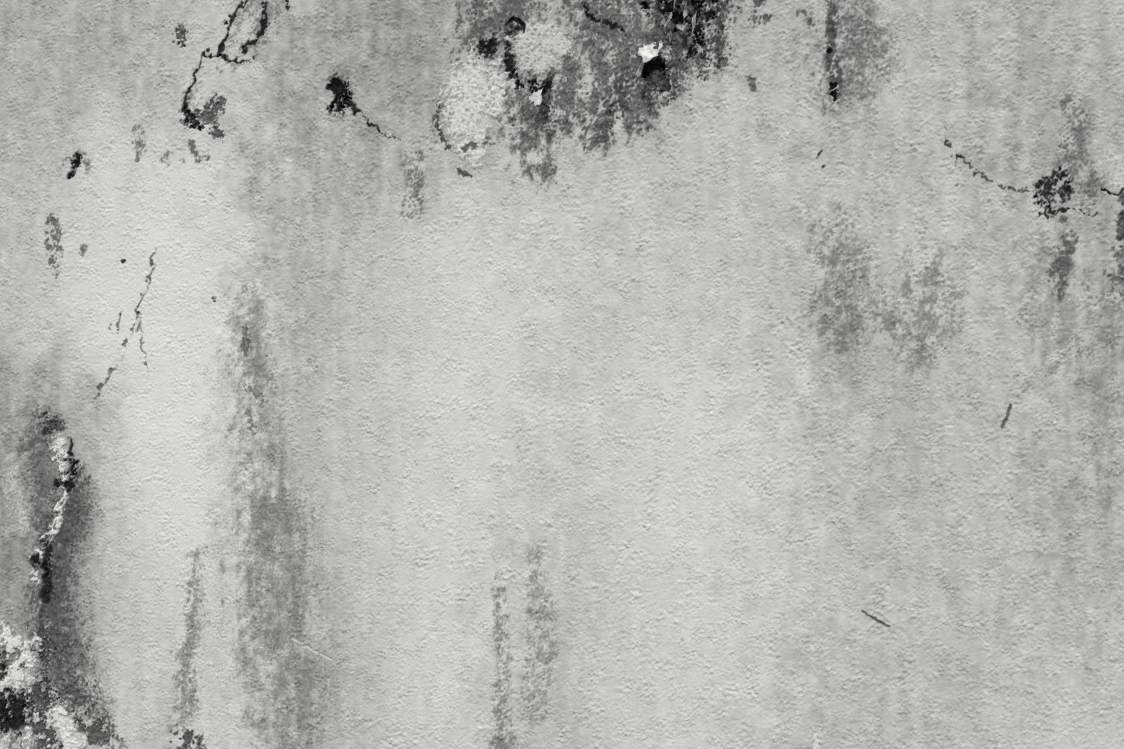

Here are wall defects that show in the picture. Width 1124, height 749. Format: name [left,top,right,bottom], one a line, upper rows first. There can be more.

crack [182,0,289,113]
crack [347,102,395,139]
damp [444,0,739,184]
damp [796,0,888,114]
crack [944,140,1038,197]
crack [117,258,154,327]
flaking render [0,408,123,749]
peeling [170,730,206,749]